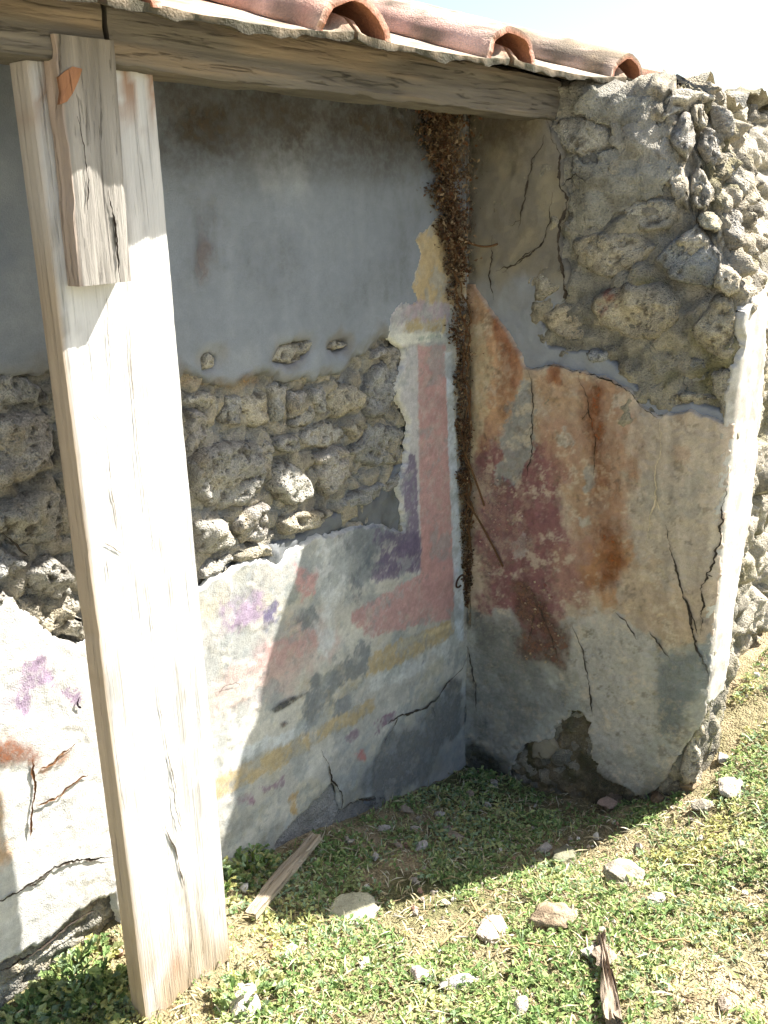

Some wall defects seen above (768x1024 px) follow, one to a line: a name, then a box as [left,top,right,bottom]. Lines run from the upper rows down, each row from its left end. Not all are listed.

crack [488,122,586,302]
crack [525,365,731,680]
crack [529,587,592,711]
crack [30,743,88,842]
crack [321,750,385,811]
spalling [512,710,648,804]
crack [0,856,113,902]